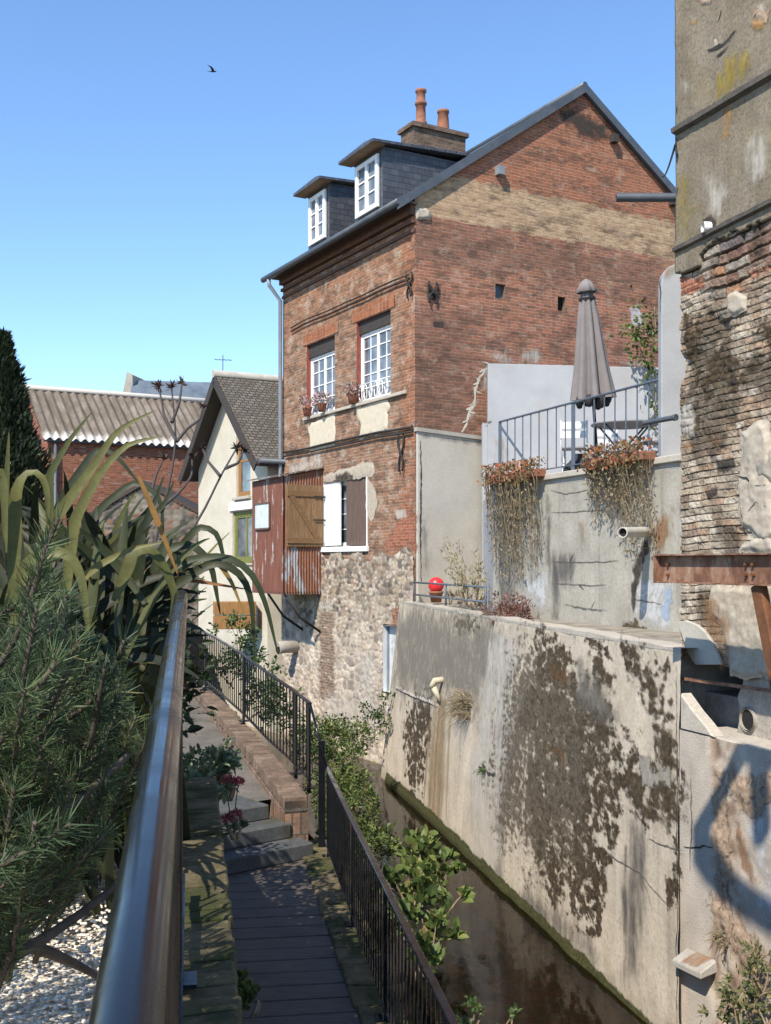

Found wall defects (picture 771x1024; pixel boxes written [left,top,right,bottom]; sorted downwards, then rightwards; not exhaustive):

spalling [680,275,705,295]
flaking render [323,461,378,522]
rust [654,517,668,549]
flaking render [716,419,771,553]
damp [394,604,517,866]
damp [523,809,641,959]
crack [591,764,712,1019]
damp [665,836,682,910]